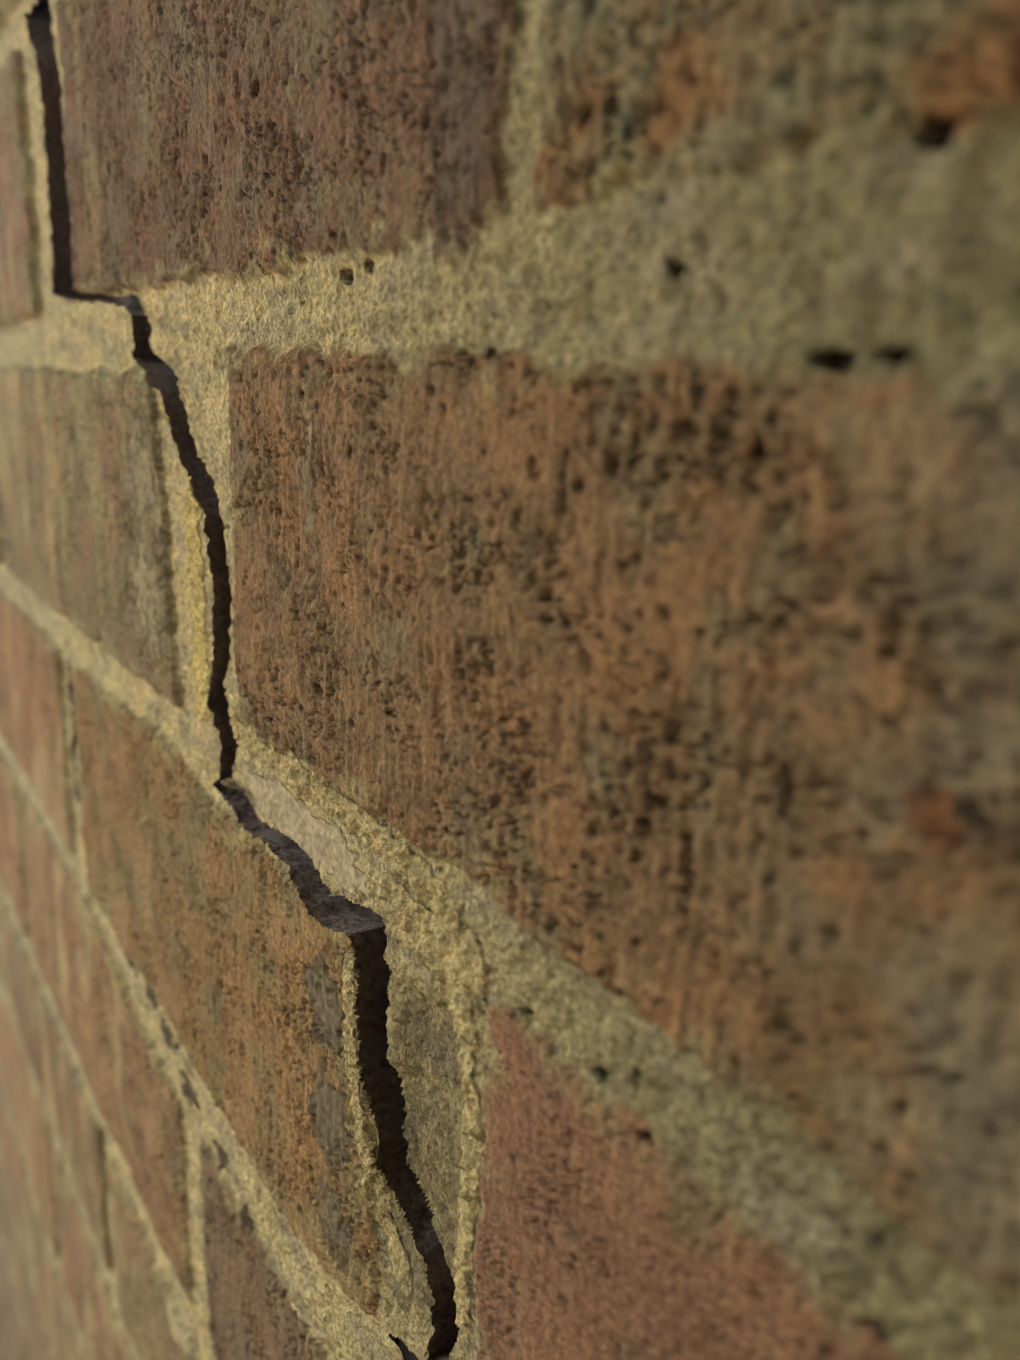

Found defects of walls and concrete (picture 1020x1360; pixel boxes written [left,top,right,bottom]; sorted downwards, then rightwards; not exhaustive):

crack [23,7,460,1360]